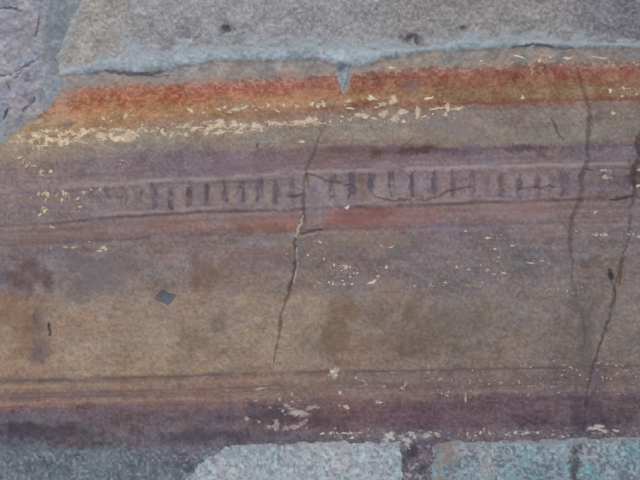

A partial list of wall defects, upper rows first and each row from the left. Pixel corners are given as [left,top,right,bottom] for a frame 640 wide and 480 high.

peeling [11,95,469,151]
crack [290,215,323,286]
peeling [245,387,320,431]
peeling [382,430,441,449]